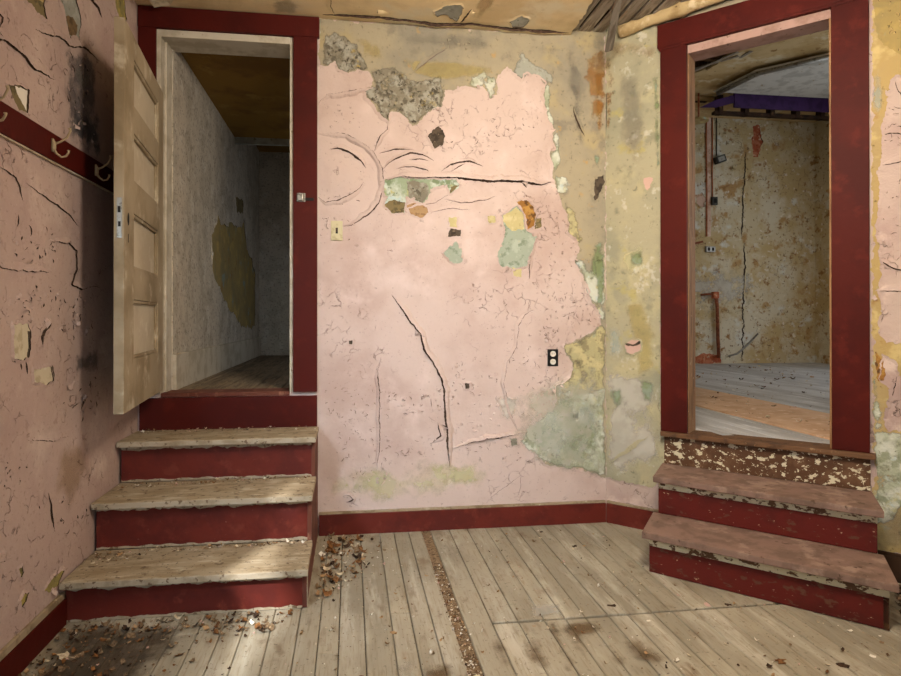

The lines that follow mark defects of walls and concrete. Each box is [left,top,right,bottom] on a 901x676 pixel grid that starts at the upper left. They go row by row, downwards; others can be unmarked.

crack [0,8,98,80]
peeling [57,0,82,41]
crack [323,0,567,73]
peeling [5,79,30,117]
damp [68,57,99,152]
crack [0,164,100,290]
peeling [211,196,255,330]
crack [317,124,552,226]
peeling [317,0,746,490]
crack [740,151,748,361]
peeling [7,284,96,389]
crack [392,295,533,468]